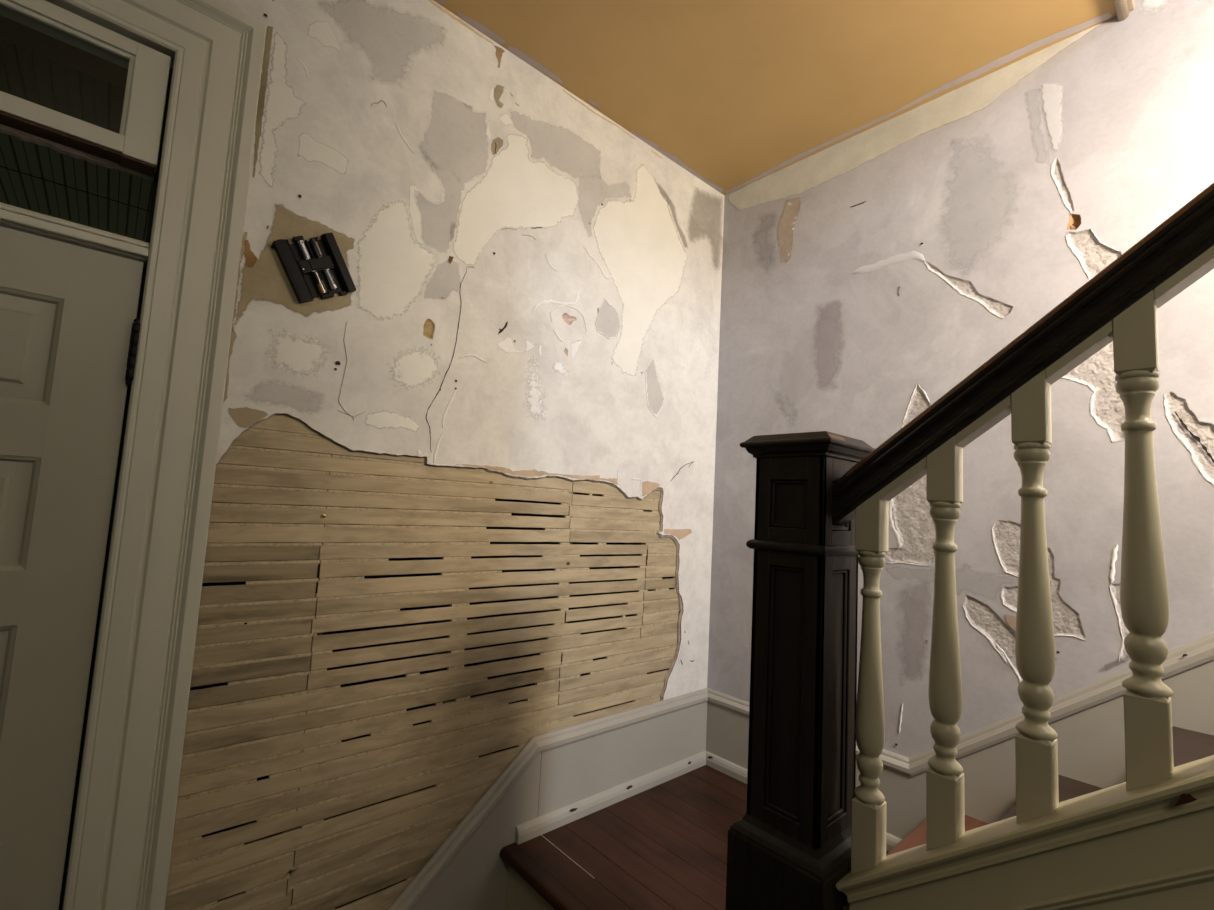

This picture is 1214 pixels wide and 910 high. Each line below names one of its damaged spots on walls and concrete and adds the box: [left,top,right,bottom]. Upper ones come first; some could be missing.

spalling [1050,158,1122,281]
spalling [924,261,1013,319]
spalling [902,383,930,428]
spalling [1062,341,1125,443]
spalling [1163,391,1214,486]
spalling [216,413,692,701]
spalling [885,474,936,566]
spalling [963,520,1023,684]
spalling [1047,548,1085,640]